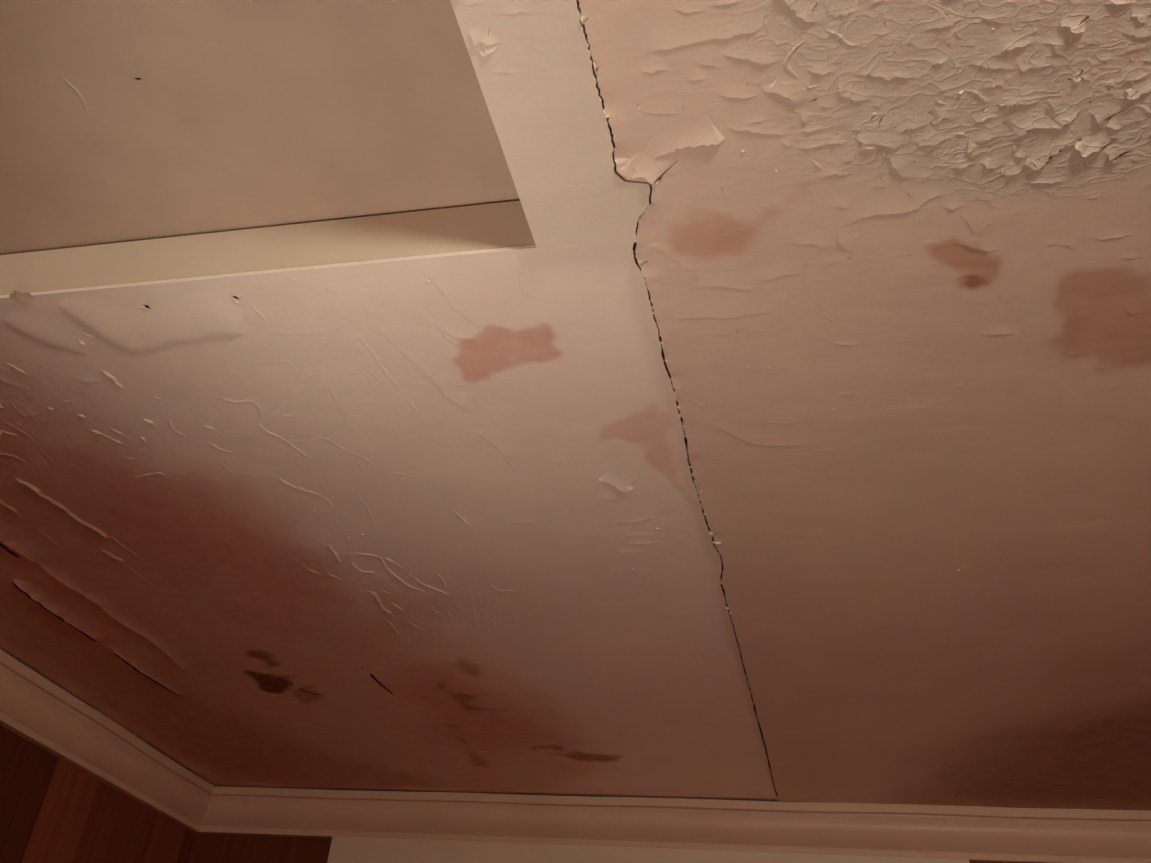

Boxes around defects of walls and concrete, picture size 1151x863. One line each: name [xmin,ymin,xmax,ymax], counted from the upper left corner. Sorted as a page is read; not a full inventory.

peeling [644,115,725,160]
peeling [720,0,1151,199]
crack [578,0,778,797]
peeling [12,477,154,587]
peeling [0,499,198,696]